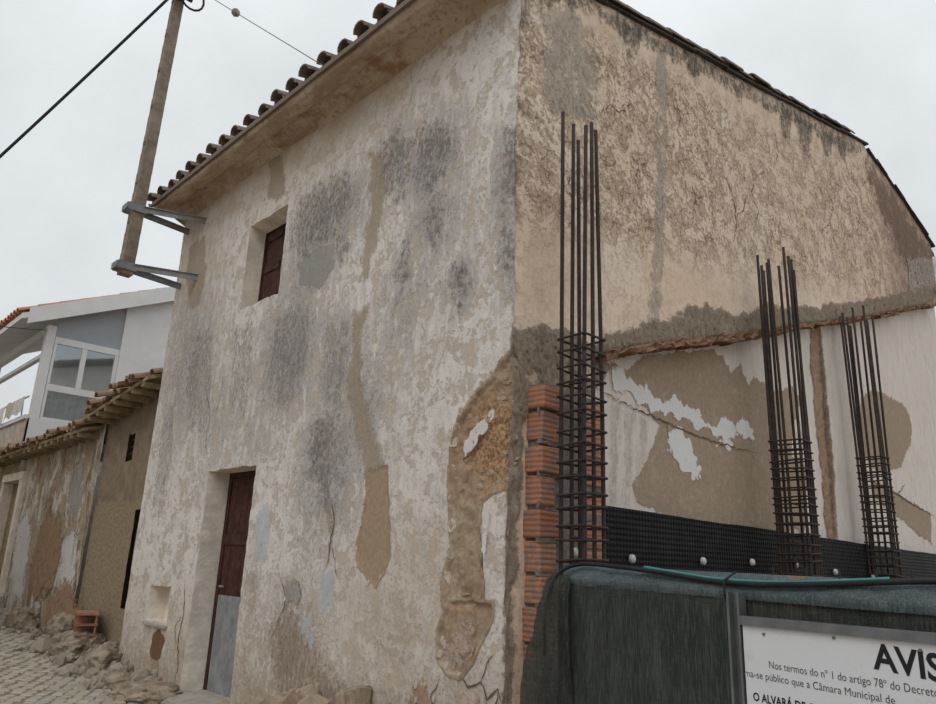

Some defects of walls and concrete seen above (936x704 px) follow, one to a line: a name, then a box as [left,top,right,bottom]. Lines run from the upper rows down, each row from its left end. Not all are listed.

water stain [519,0,936,293]
water stain [359,152,386,280]
crack [598,389,757,453]
peeling [610,349,807,533]
peeling [861,390,912,471]
spalling [28,507,81,624]
peeling [355,464,391,589]
spalling [435,350,520,682]